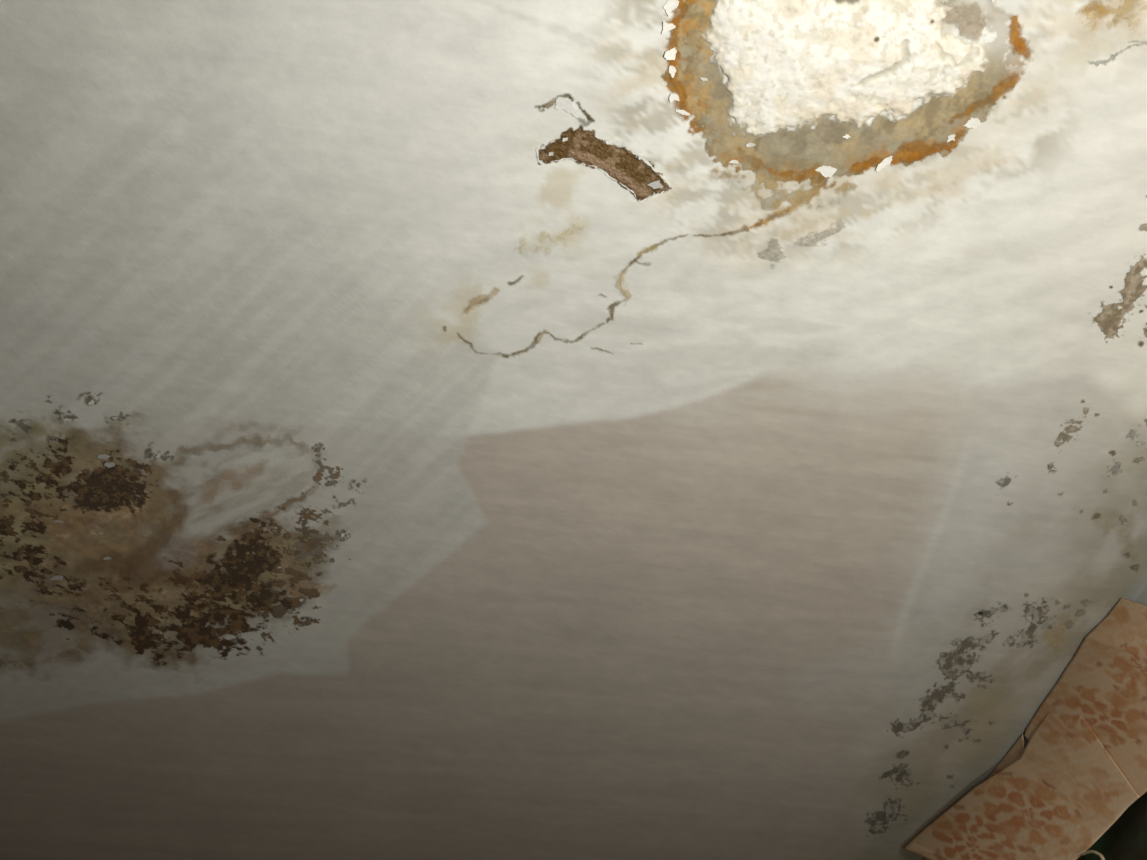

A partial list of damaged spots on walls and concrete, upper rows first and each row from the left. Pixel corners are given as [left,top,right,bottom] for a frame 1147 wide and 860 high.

spalling [536,94,671,203]
crack [444,225,576,346]
crack [503,229,749,358]
peeling [1093,256,1147,346]
peeling [1055,400,1099,447]
peeling [1107,419,1147,476]
leakage [0,396,366,665]
peeling [892,593,1089,748]
peeling [865,798,908,834]
peeling [880,751,918,787]